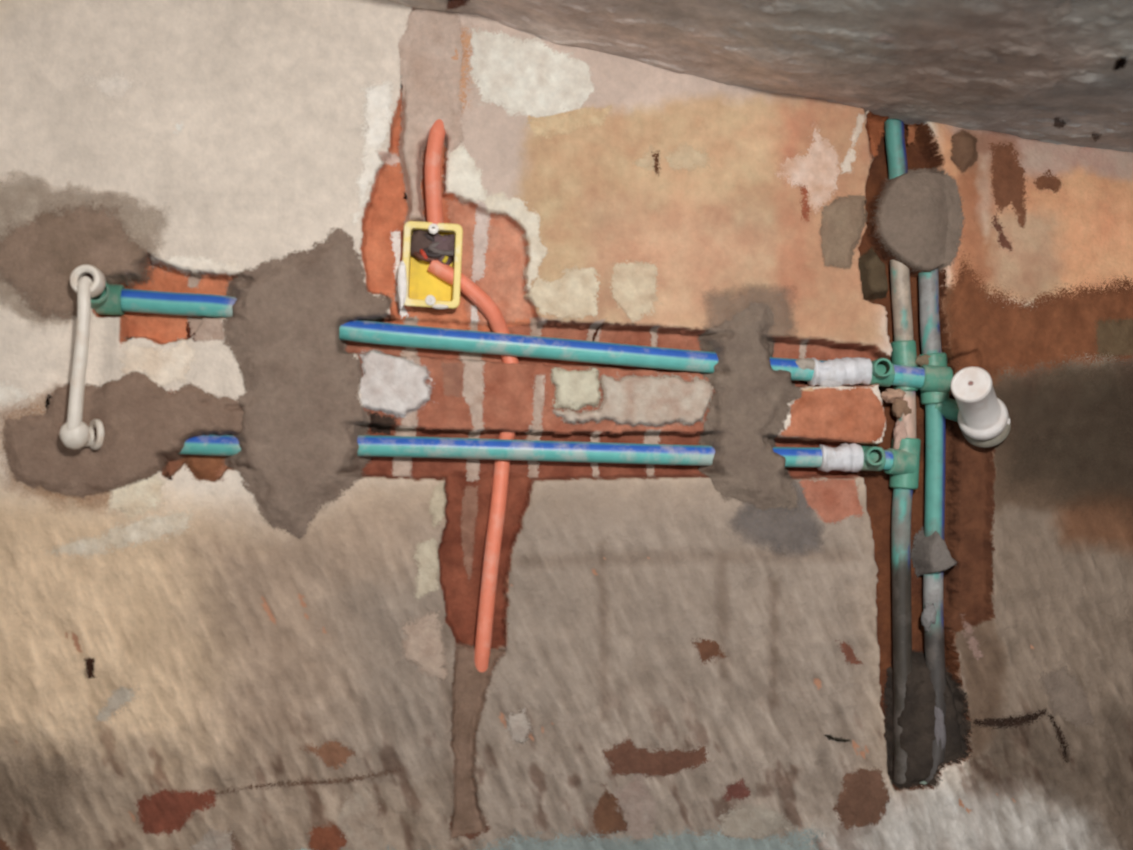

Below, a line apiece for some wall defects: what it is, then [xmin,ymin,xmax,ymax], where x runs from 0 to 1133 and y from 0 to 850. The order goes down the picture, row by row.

spalling [351,80,492,332]
spalling [441,139,706,351]
spalling [343,341,716,445]
spalling [774,380,897,450]
spalling [133,788,217,837]
spalling [359,456,495,682]
spalling [491,460,710,649]
spalling [590,736,710,838]
spalling [691,638,727,665]
spalling [787,467,893,738]
spalling [831,389,997,832]
crack [972,708,1070,763]